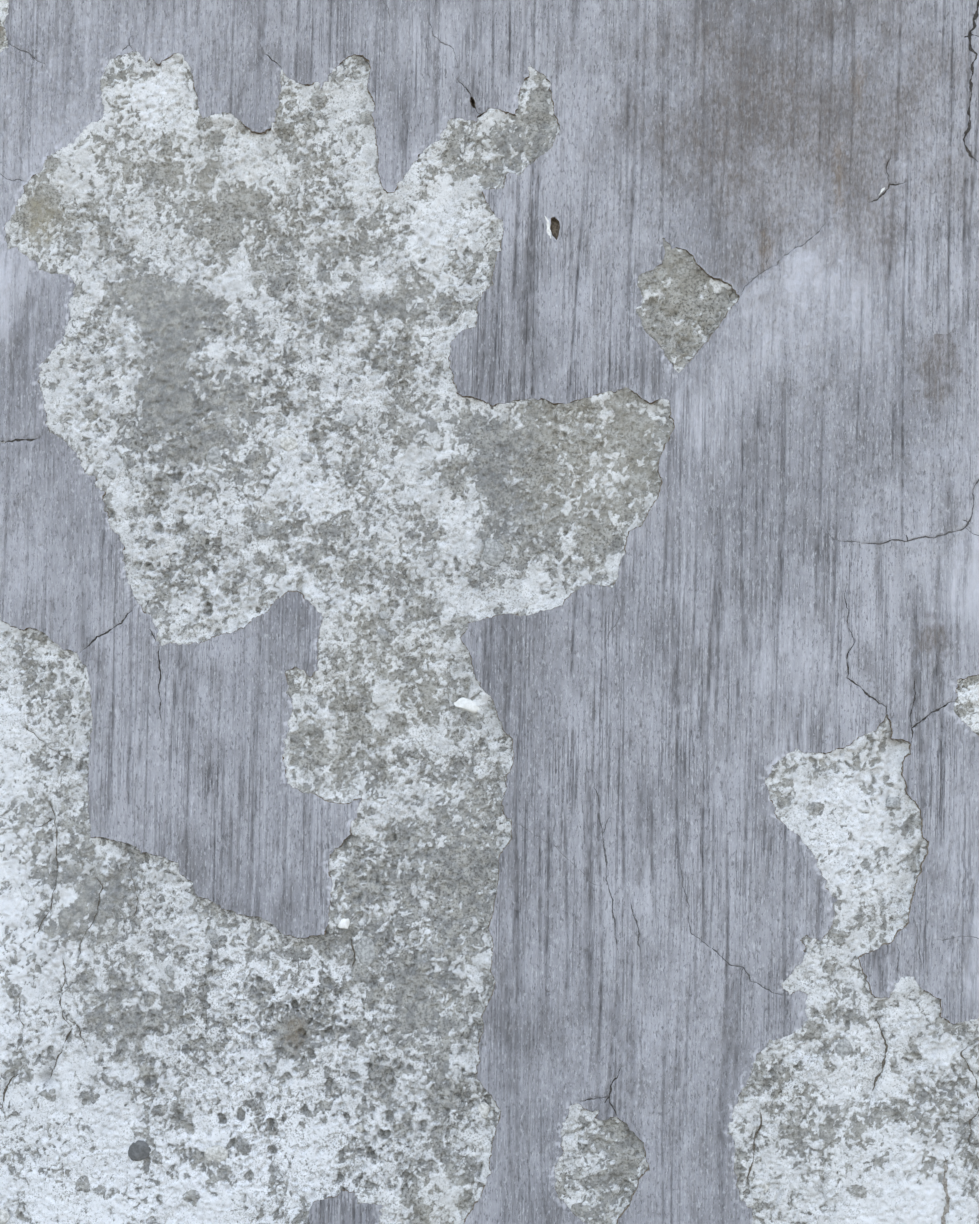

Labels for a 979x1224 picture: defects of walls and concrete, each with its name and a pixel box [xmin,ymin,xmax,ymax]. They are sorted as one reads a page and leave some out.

spalling [0,0,9,53]
crack [963,0,979,162]
spalling [636,238,740,373]
crack [743,225,824,290]
crack [826,479,979,545]
spalling [0,51,675,1224]
crack [844,590,955,743]
spalling [954,675,979,736]
crack [50,873,103,1078]
spalling [727,714,979,1224]
crack [0,998,26,1109]